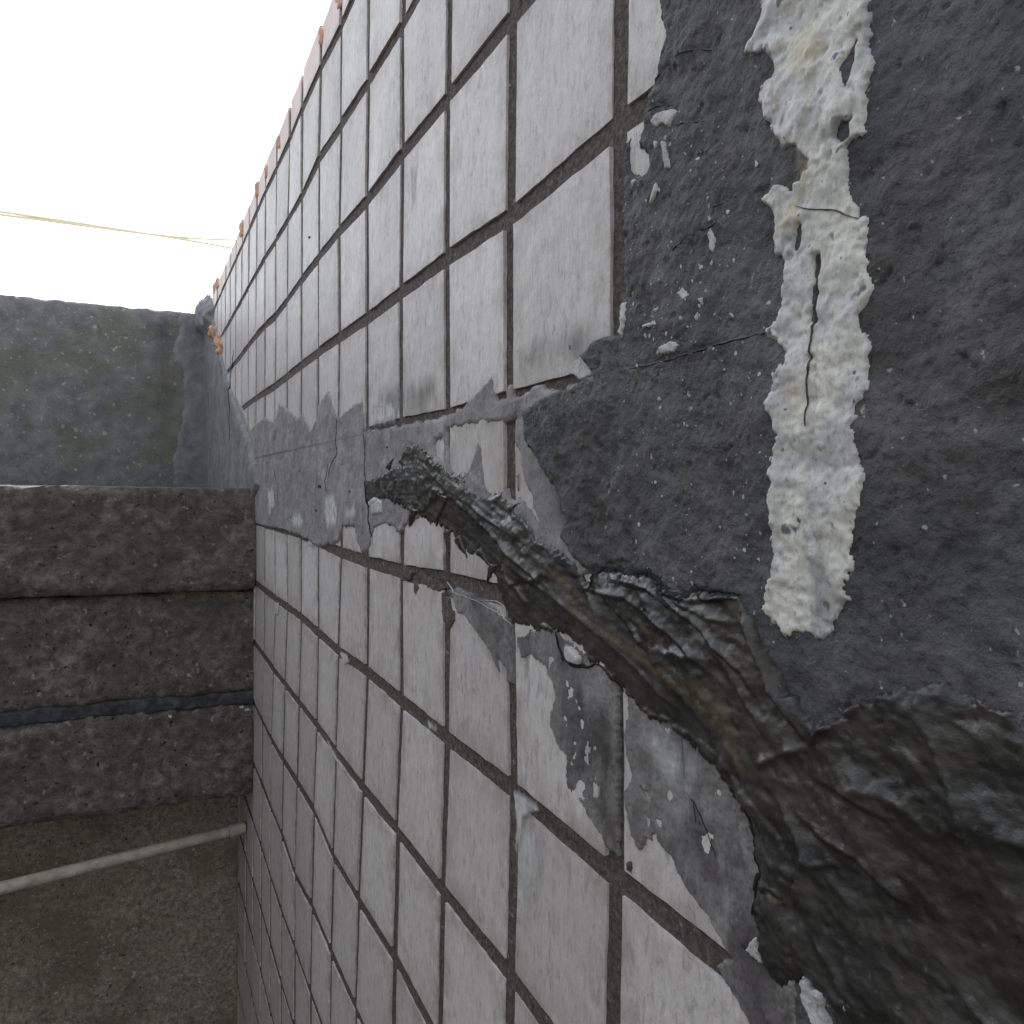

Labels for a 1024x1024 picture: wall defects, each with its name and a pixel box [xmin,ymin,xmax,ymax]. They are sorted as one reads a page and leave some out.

peeling [647,100,681,169]
peeling [645,182,660,204]
peeling [617,193,745,371]
peeling [744,0,876,640]
spalling [569,337,604,371]
crack [621,333,764,372]
spalling [368,497,383,515]
spalling [564,644,582,665]
leakage [514,793,538,894]